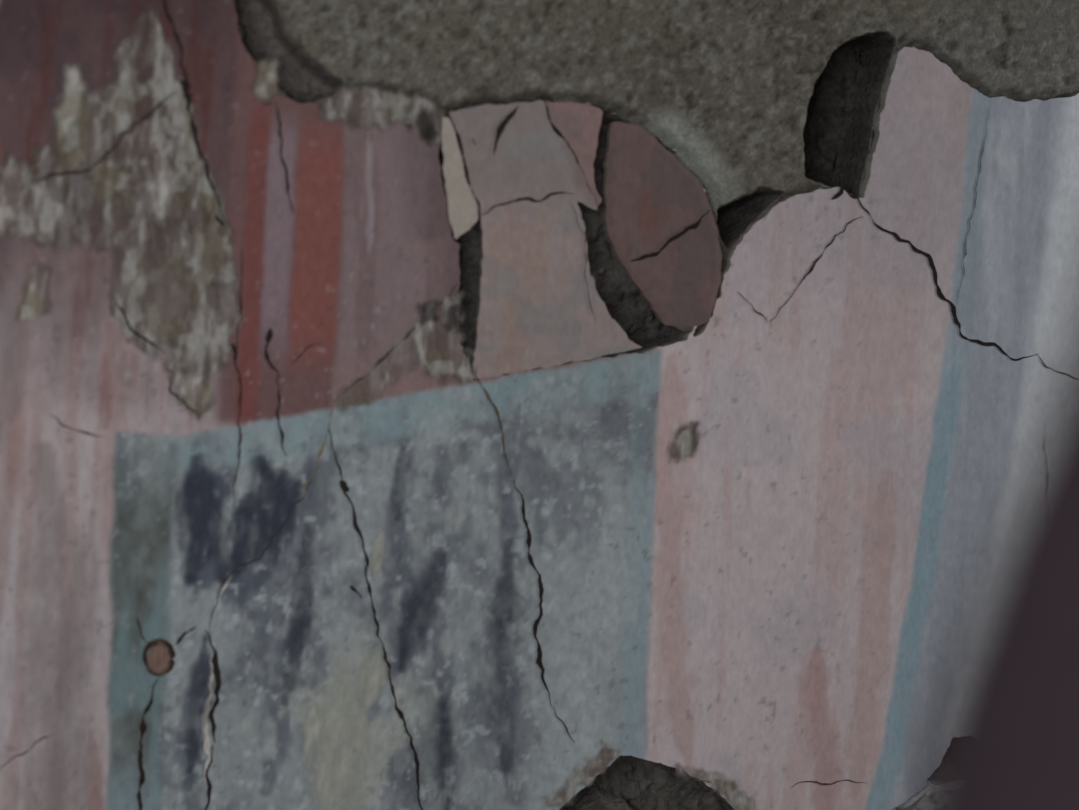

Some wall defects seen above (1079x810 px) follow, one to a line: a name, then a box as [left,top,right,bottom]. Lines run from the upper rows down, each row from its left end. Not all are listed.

peeling [0,10,243,419]
crack [21,0,243,508]
crack [263,101,294,213]
spalling [234,0,478,239]
spalling [803,32,894,197]
crack [738,115,1066,375]
crack [259,285,457,810]
crack [472,360,575,743]
crack [137,679,158,810]
crack [176,569,234,810]
peeling [547,746,619,807]
peeling [676,764,755,810]